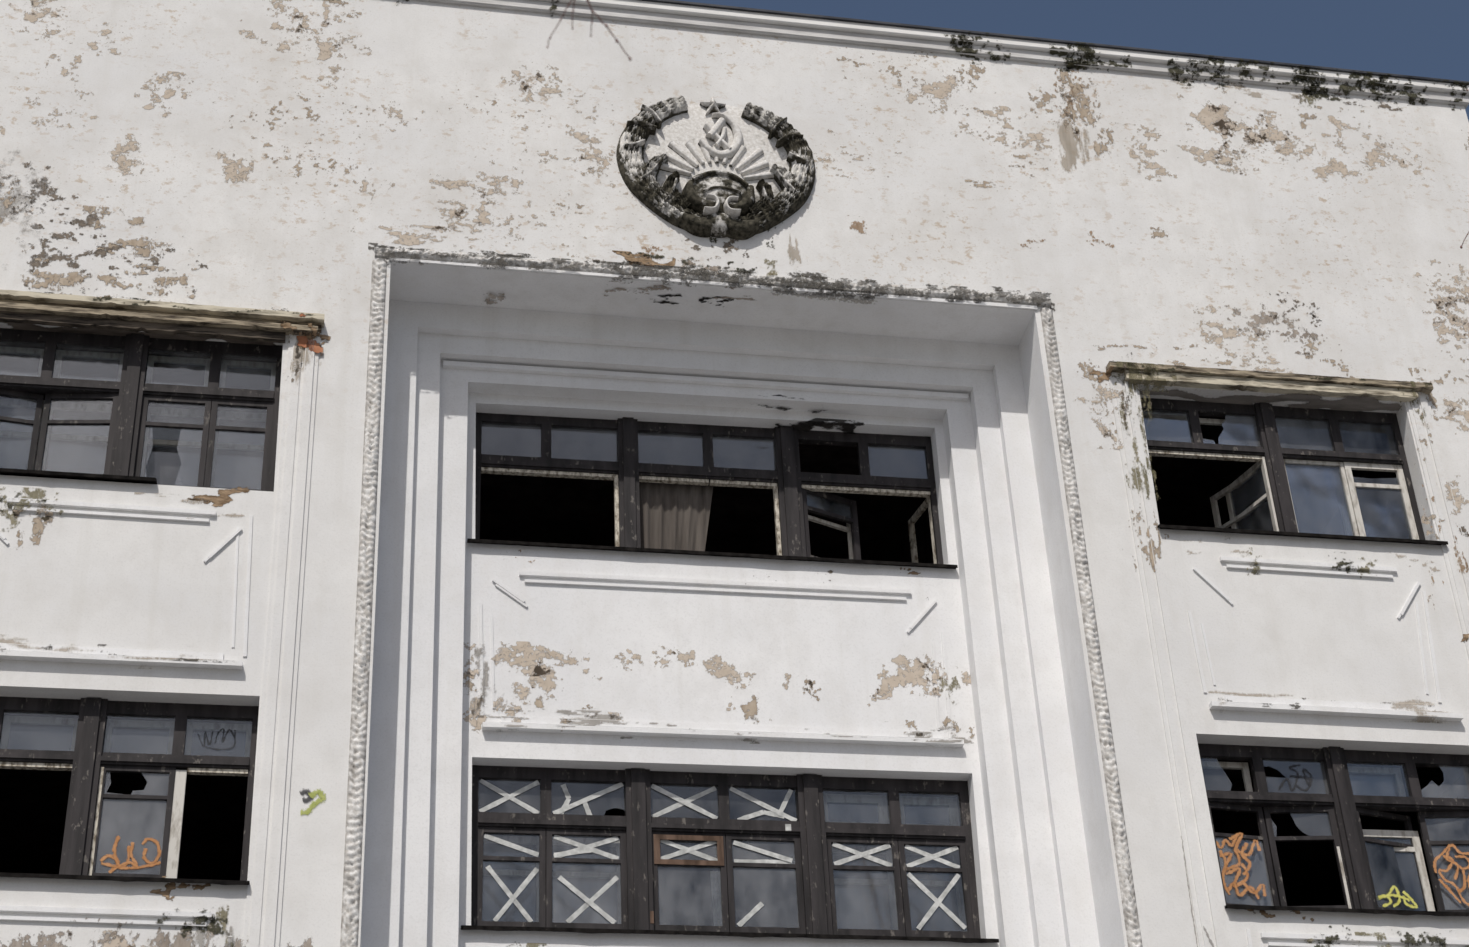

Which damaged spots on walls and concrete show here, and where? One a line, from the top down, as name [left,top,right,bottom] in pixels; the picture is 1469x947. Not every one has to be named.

peeling [212,0,423,196]
peeling [378,62,628,252]
peeling [837,47,1056,177]
peeling [1101,87,1425,182]
water stain [1292,89,1402,111]
peeling [10,161,208,303]
peeling [1172,291,1354,378]
peeling [1408,259,1469,434]
peeling [463,641,602,730]
peeling [615,646,759,724]
peeling [867,654,975,739]
peeling [0,918,157,947]